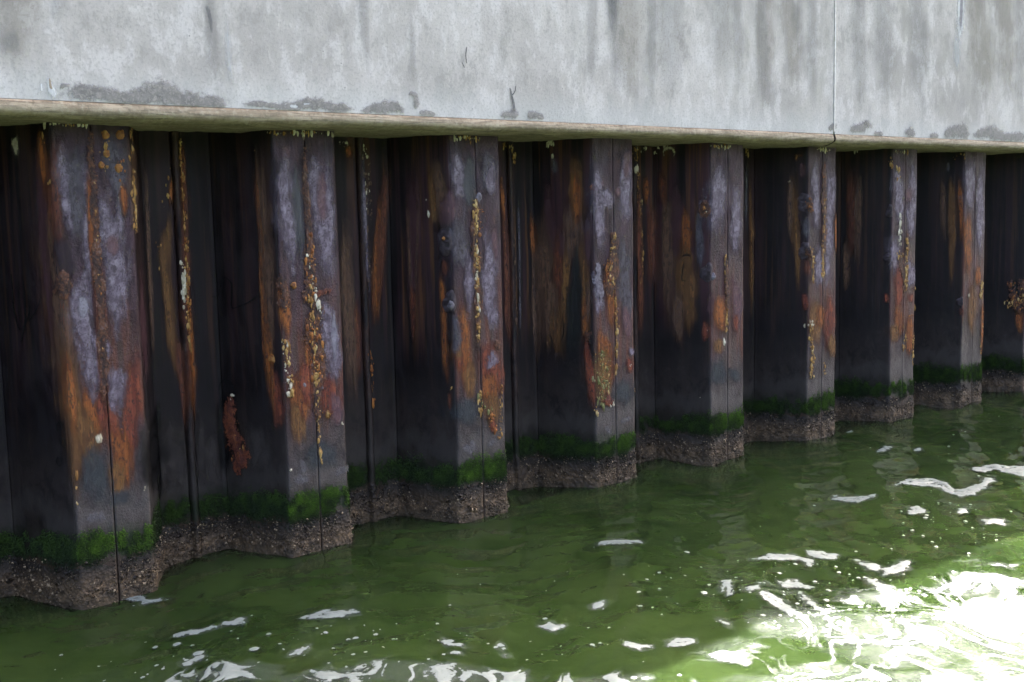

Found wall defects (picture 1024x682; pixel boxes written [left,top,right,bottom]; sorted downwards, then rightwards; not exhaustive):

leakage [409,92,435,116]
rust [37,128,196,493]
rust [256,136,376,464]
rust [339,141,388,313]
rust [440,180,521,439]
rust [558,159,634,417]
rust [634,147,754,384]
rust [803,295,836,378]
rust [884,213,916,365]
rust [940,180,984,360]
rust [1004,278,1024,331]
rust [217,394,252,475]